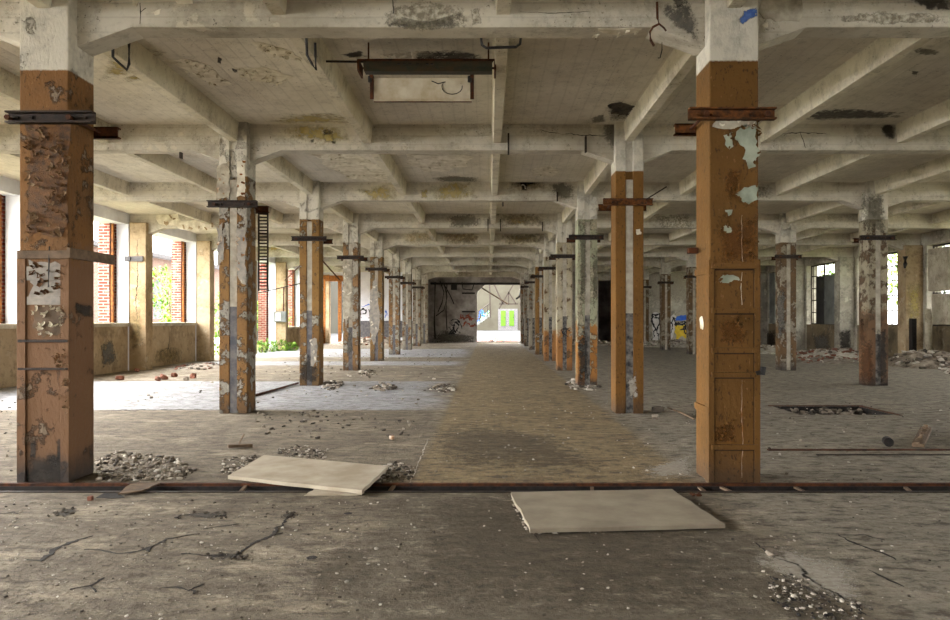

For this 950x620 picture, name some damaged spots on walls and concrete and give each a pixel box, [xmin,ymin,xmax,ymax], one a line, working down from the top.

leakage [391,14,464,30]
leakage [807,109,903,139]
peeling [22,124,71,243]
peeling [216,160,246,200]
peeling [712,121,762,261]
peeling [28,259,64,337]
crack [70,577,105,592]
crack [27,517,289,562]
crack [159,583,205,594]
crack [756,543,867,615]
crack [838,534,904,587]